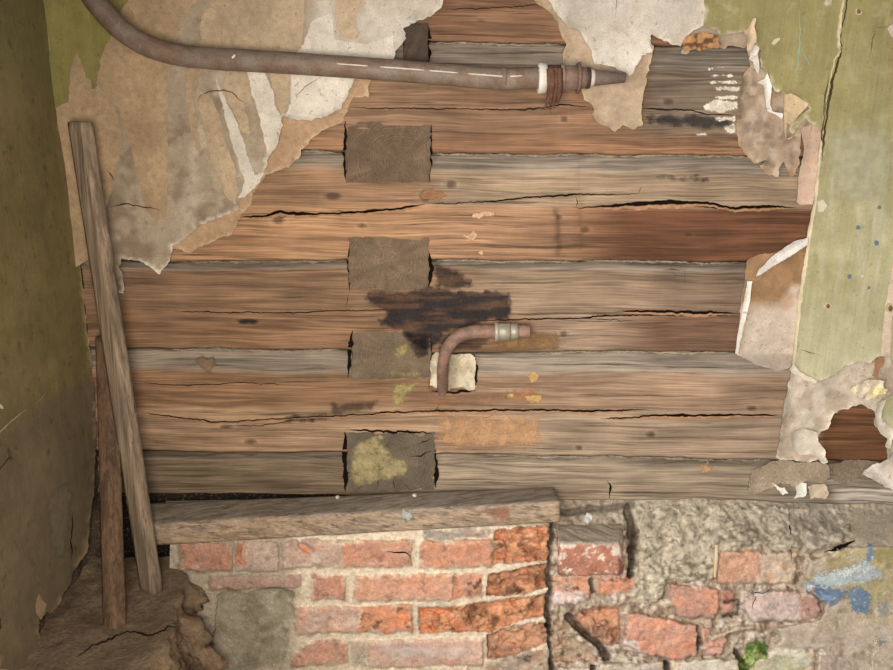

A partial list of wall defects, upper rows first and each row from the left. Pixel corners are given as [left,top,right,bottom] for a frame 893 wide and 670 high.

flaking render [43,0,354,293]
flaking render [298,0,443,59]
crack [244,188,795,219]
flaking render [548,0,893,490]
crack [821,0,848,160]
peeling [35,594,47,619]
spalling [429,525,550,658]